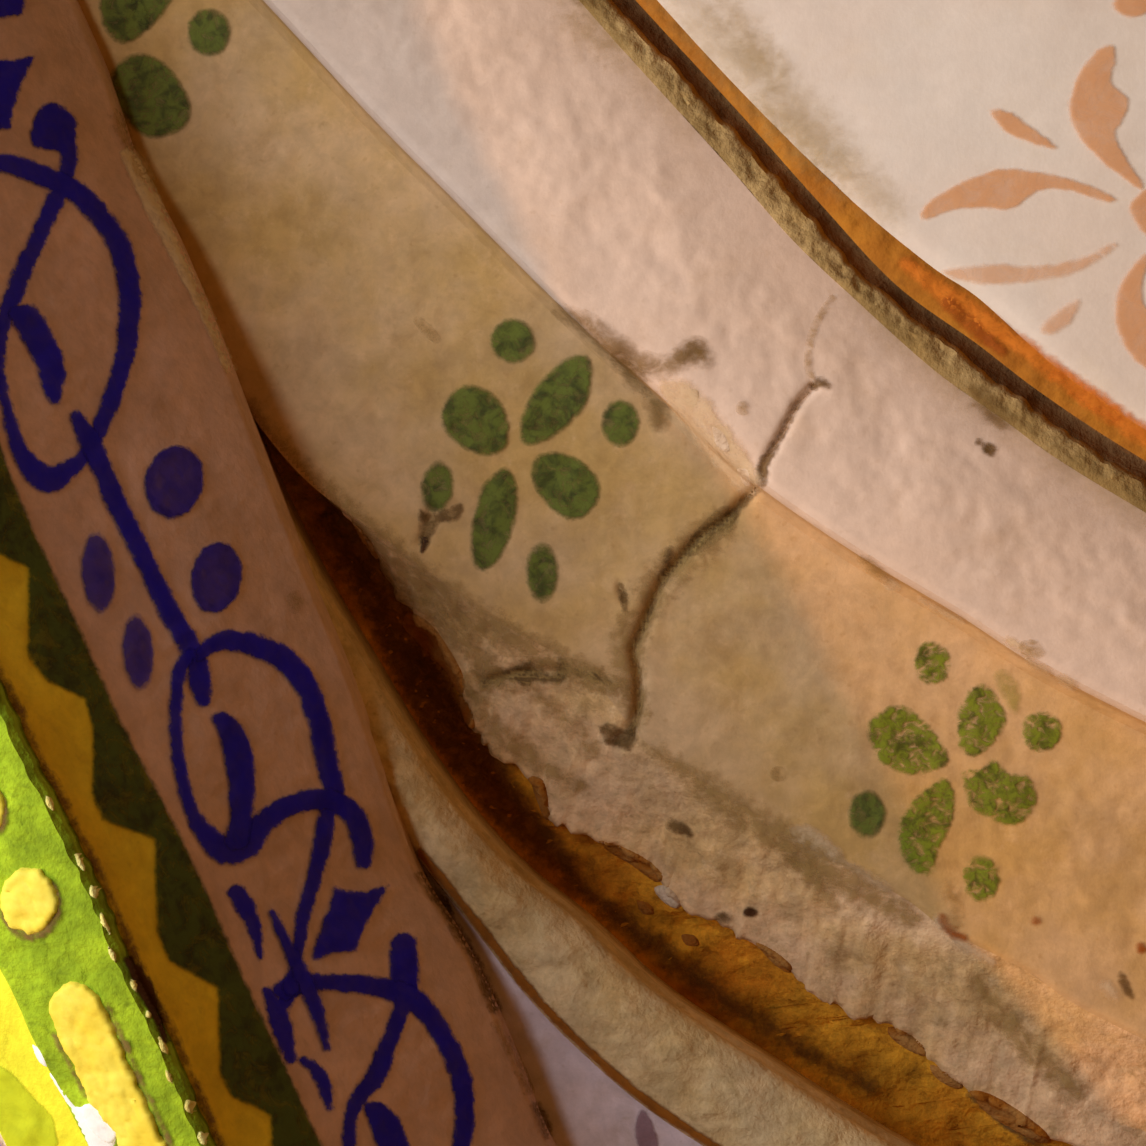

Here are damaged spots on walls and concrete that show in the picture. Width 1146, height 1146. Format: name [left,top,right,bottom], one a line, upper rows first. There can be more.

damp [564,313,704,386]
crack [464,364,829,750]
rust [941,915,966,940]